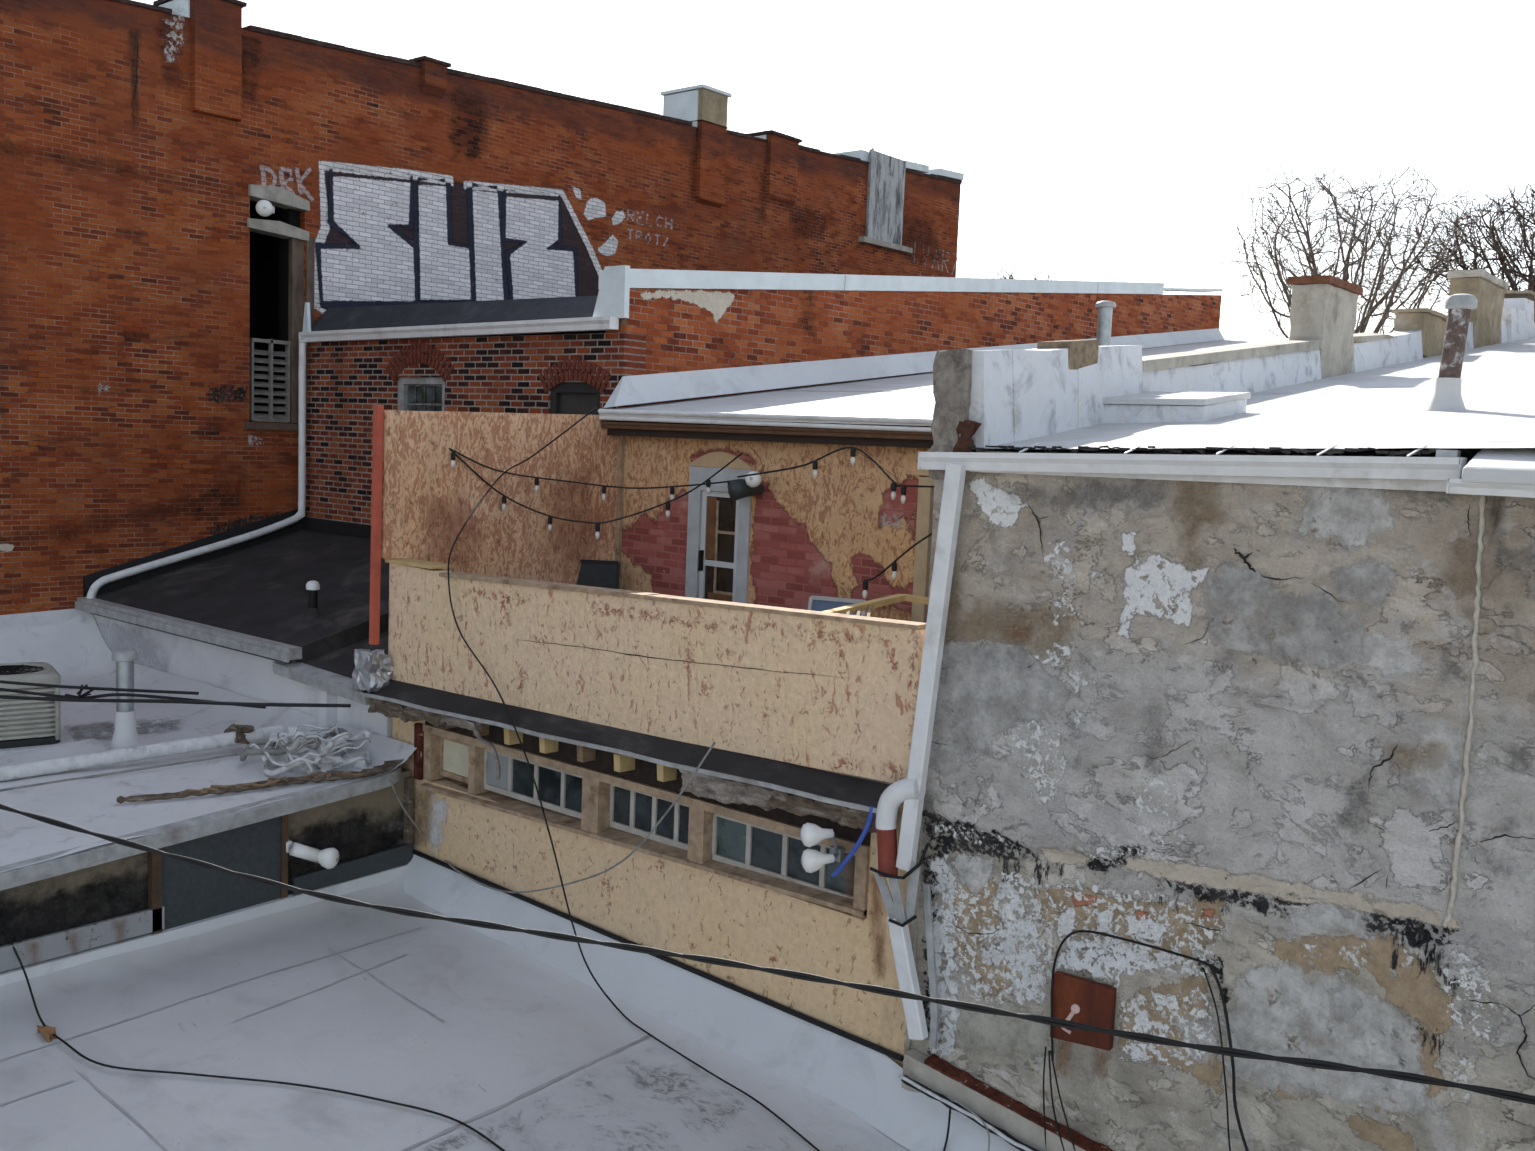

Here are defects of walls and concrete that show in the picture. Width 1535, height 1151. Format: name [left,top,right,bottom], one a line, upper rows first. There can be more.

peeling [967,476,1029,529]
spalling [592,489,768,632]
spalling [690,448,921,696]
peeling [1117,531,1210,639]
crack [1234,548,1350,602]
leakage [1087,845,1146,875]
mould [0,875,148,946]
leakage [1161,875,1310,918]
leakage [1362,911,1459,948]
crack [1469,1000,1535,1079]
spalling [1348,1097,1419,1151]